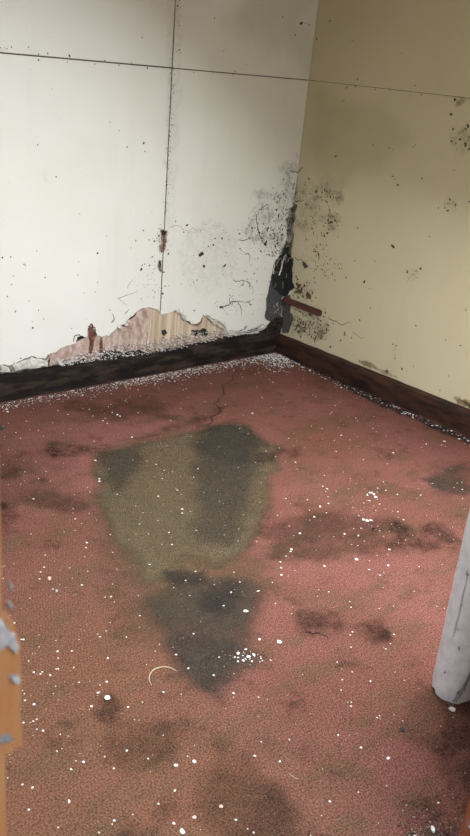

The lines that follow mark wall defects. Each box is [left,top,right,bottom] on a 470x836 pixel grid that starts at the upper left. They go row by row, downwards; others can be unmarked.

peeling [0,307,267,374]
damp [193,166,347,348]
damp [94,425,278,690]